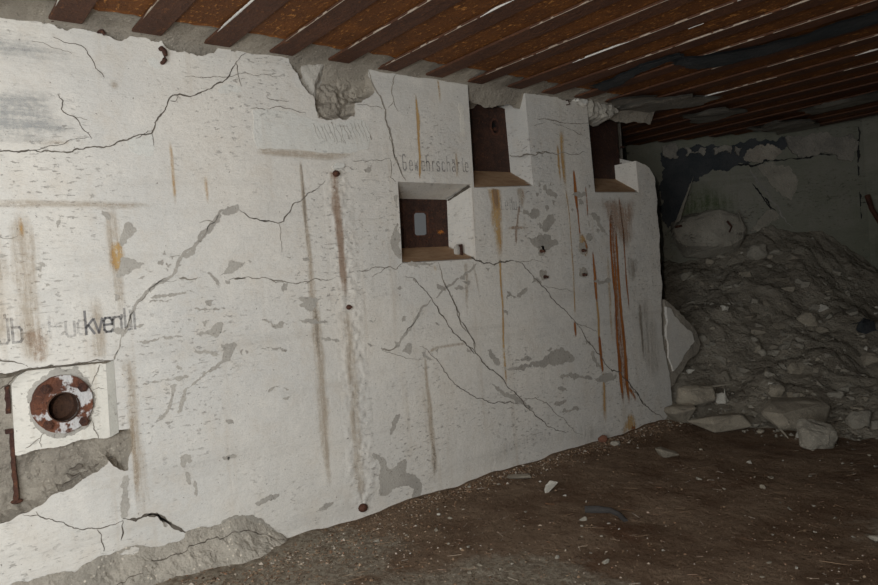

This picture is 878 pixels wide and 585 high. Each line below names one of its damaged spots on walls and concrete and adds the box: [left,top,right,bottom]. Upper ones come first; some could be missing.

crack [0,53,283,153]
crack [251,98,305,113]
spalling [291,64,375,120]
crack [0,181,336,390]
corrosion [331,173,346,284]
corrosion [557,135,636,411]
crack [359,257,661,434]
corrosion [5,428,23,504]
spalling [0,360,133,524]
flaking render [372,453,422,498]
crack [24,512,186,549]
spalling [11,494,288,585]